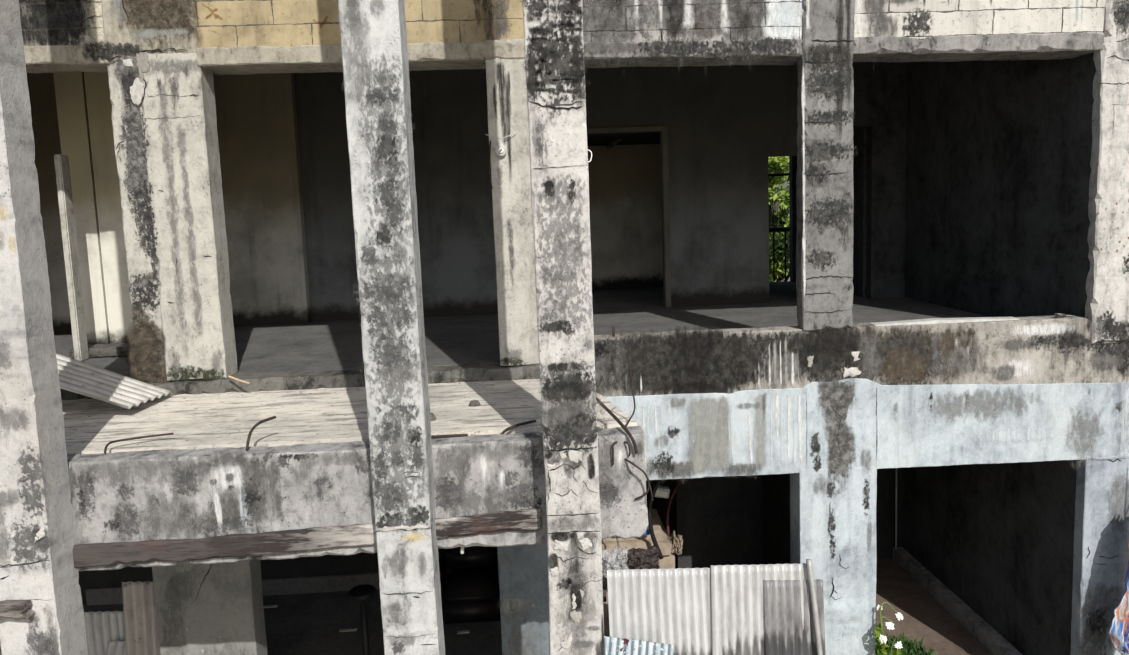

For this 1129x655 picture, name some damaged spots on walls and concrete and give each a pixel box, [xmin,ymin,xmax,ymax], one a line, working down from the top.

leakage [582,0,932,183]
leakage [119,104,158,280]
leakage [151,60,201,328]
leakage [344,0,413,380]
mould [806,249,836,271]
mould [806,198,854,229]
leakage [68,311,1129,537]
spalling [548,532,598,651]